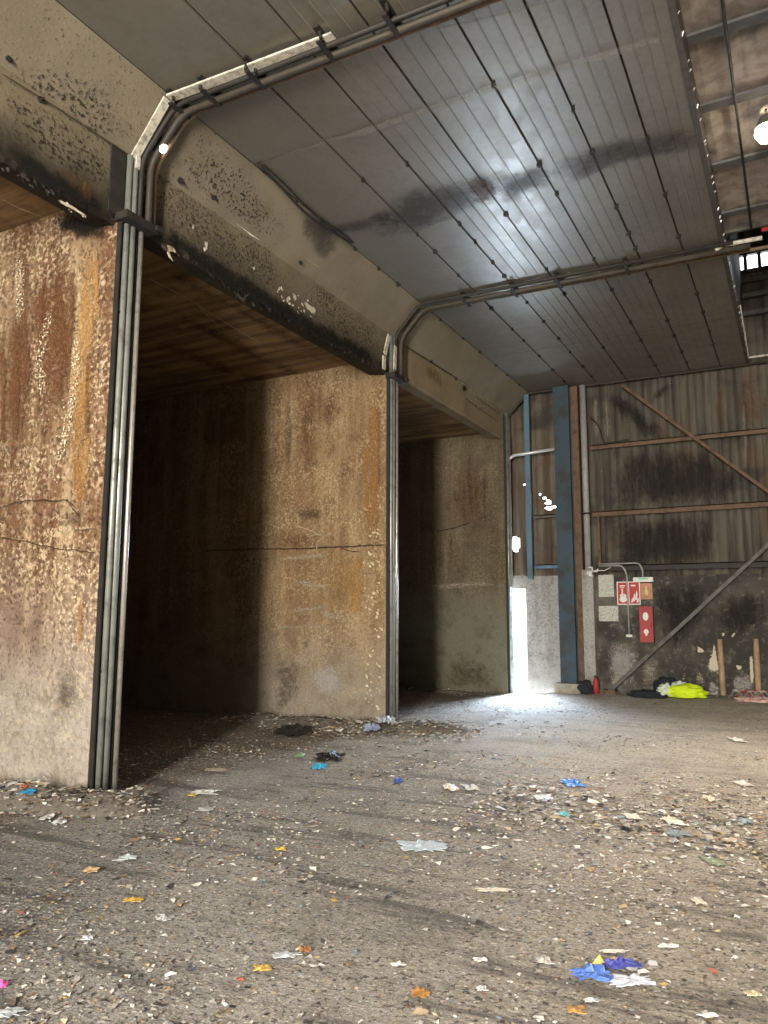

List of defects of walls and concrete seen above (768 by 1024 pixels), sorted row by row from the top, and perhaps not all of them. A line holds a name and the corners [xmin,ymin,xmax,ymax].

leakage [17,69,117,133]
leakage [8,100,104,181]
leakage [189,159,279,233]
leakage [307,189,478,252]
leakage [506,172,541,193]
leakage [578,135,679,176]
spalling [161,243,316,331]
corrosion [0,261,99,499]
crack [0,494,93,553]
crack [206,524,384,552]